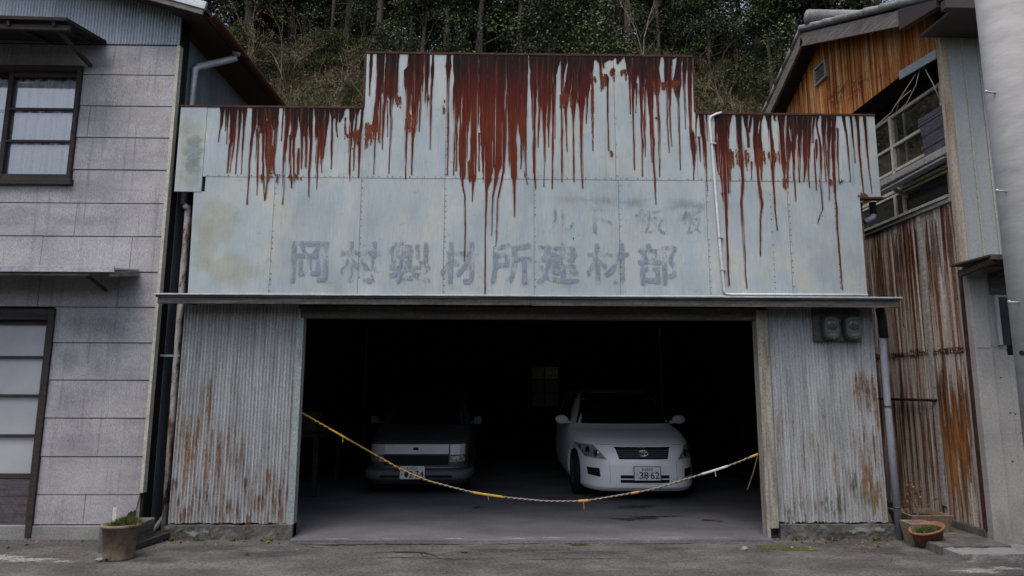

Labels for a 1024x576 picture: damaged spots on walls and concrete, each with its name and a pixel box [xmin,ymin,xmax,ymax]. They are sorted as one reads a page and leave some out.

rust [218,54,872,294]
rust [171,386,288,525]
rust [849,341,976,519]